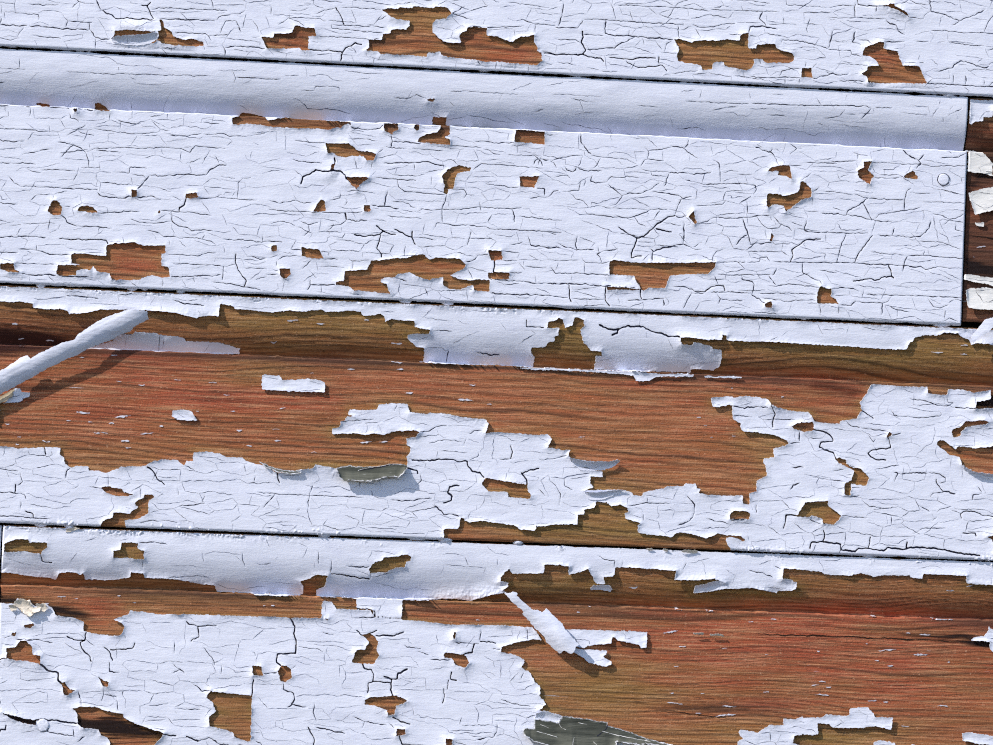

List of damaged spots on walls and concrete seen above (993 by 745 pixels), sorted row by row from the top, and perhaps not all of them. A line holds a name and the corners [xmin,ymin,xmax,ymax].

peeling [261,25,316,51]
peeling [366,6,542,65]
peeling [674,33,794,70]
peeling [862,42,927,84]
crack [0,0,993,370]
peeling [0,99,993,559]
crack [627,390,993,589]
peeling [0,572,379,665]
crack [0,407,599,745]
peeling [397,564,993,745]
peeling [207,691,252,742]
peeling [365,695,407,718]